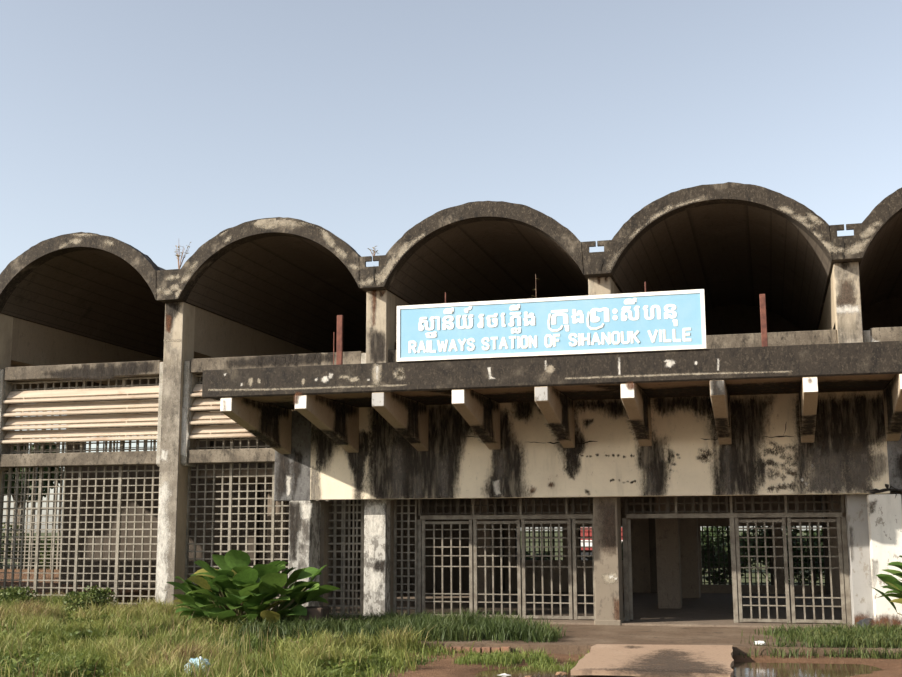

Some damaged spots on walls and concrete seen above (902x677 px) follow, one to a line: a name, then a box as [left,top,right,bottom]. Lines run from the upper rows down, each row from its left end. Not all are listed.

damp [227,353,333,369]
damp [208,364,541,561]
damp [548,360,902,496]